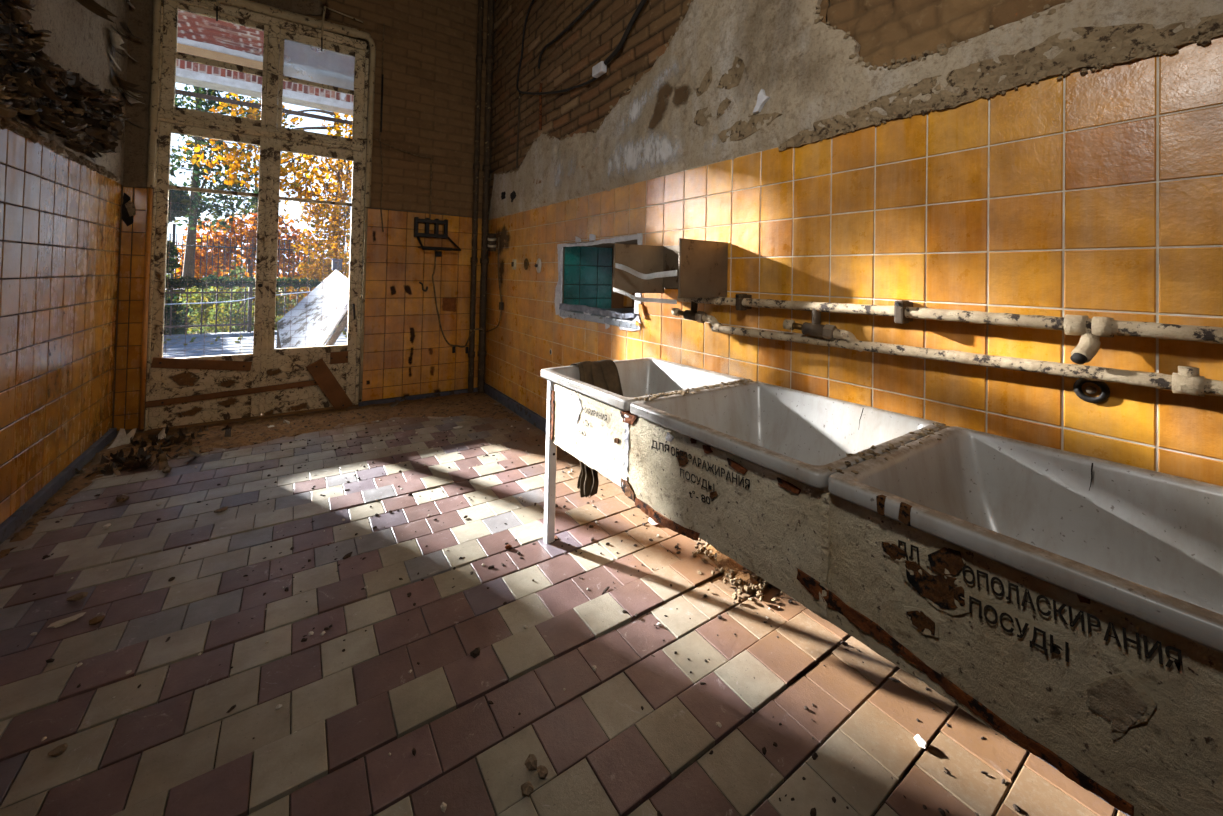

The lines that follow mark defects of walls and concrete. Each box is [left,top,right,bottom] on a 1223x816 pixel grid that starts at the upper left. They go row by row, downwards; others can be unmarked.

peeling [0,0,148,226]
flaking render [649,56,782,143]
flaking render [814,0,1073,71]
flaking render [778,13,1223,151]